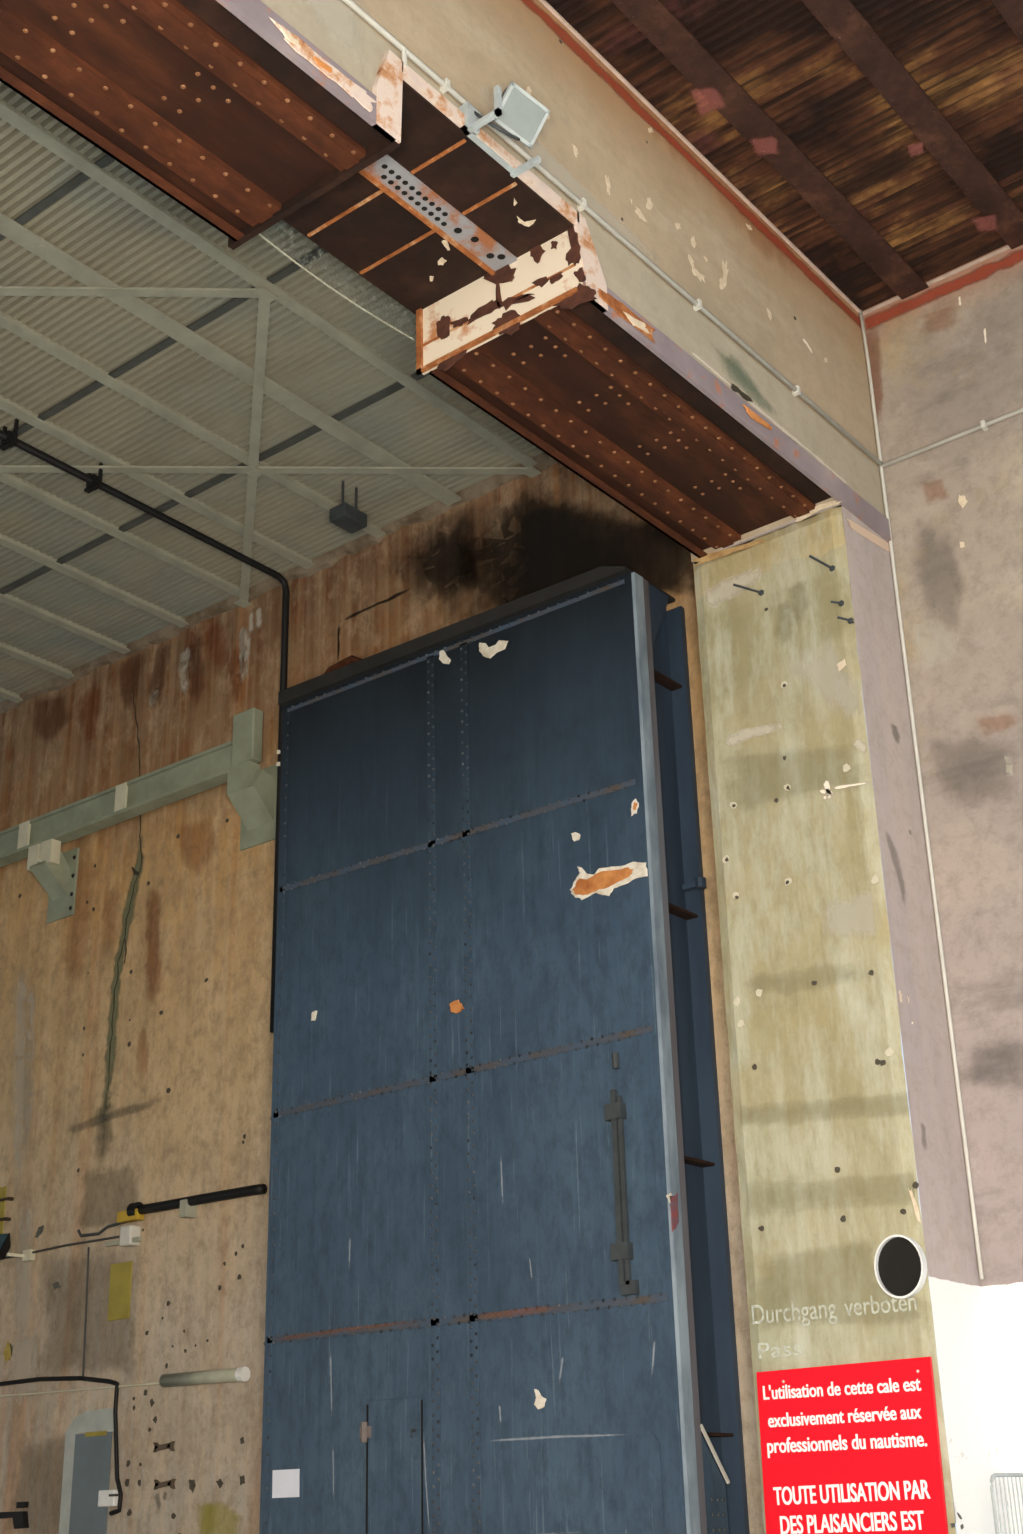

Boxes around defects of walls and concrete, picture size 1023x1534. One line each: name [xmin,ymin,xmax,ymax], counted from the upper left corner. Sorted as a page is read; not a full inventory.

peeling [430,240,450,281]
peeling [675,223,729,290]
peeling [436,224,655,343]
peeling [437,349,467,371]
peeling [743,405,772,430]
leakage [181,649,189,689]
leakage [239,608,261,677]
peeling [439,650,451,664]
peeling [479,640,508,659]
crack [132,692,140,777]
peeling [570,862,648,900]
crack [103,815,143,1116]